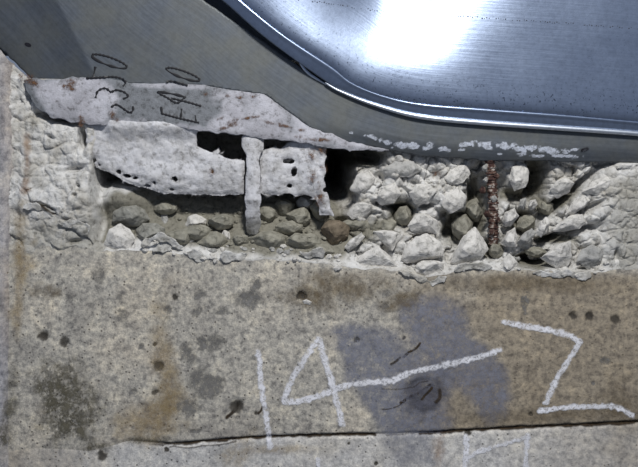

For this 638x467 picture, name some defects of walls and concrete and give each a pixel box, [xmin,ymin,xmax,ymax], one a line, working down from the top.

spalling [8,65,638,287]
corrosion [479,160,501,245]
crack [160,433,376,448]
crack [419,420,638,434]